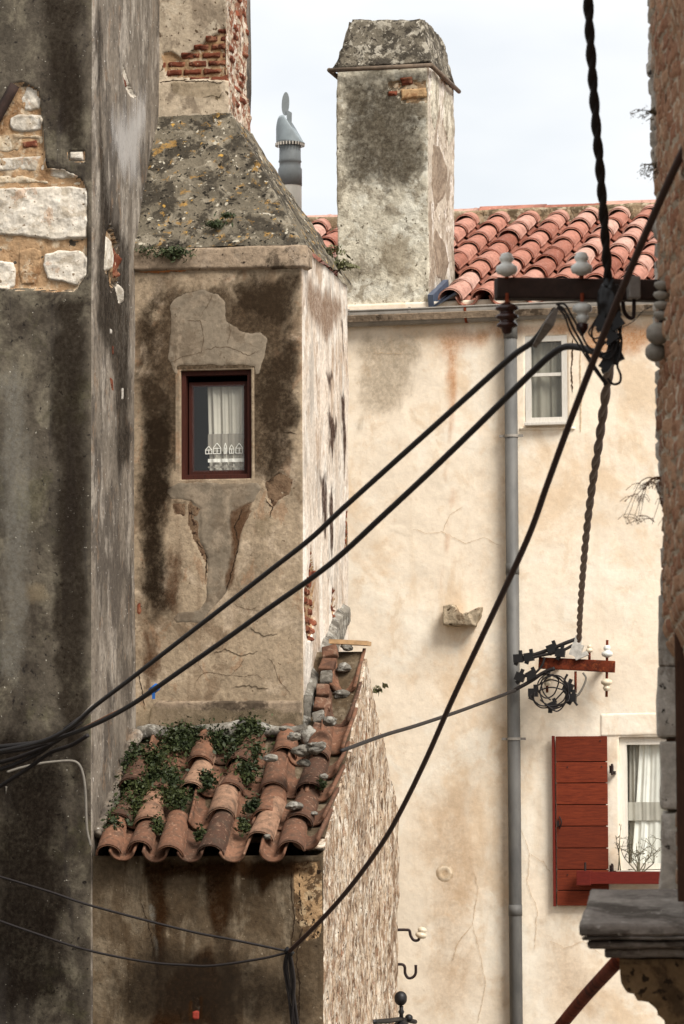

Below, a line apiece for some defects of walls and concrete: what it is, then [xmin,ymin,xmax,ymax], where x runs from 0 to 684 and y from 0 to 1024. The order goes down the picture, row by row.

flaking render [162,0,249,108]
flaking render [0,82,87,292]
flaking render [388,73,455,211]
leakage [98,129,180,618]
flaking render [172,502,208,571]
flaking render [265,473,293,507]
flaking render [304,545,317,641]
leakage [0,302,85,1007]
crack [195,660,290,693]
flaking render [294,861,323,941]